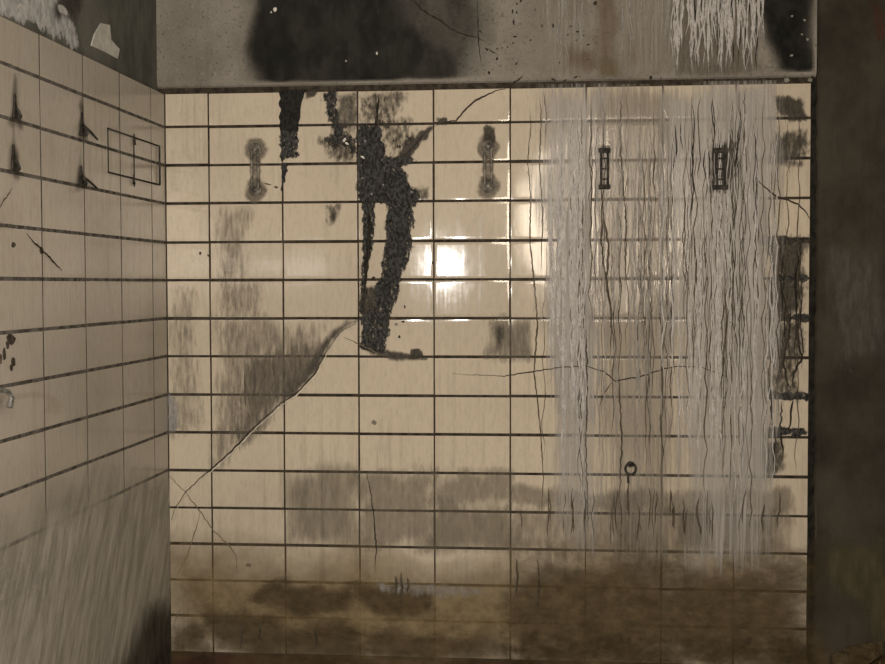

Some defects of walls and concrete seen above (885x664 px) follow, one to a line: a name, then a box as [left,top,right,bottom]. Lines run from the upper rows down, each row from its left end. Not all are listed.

damp [490,0,813,558]
crack [753,175,811,220]
crack [172,324,382,577]
crack [454,365,728,407]
damp [0,483,172,664]